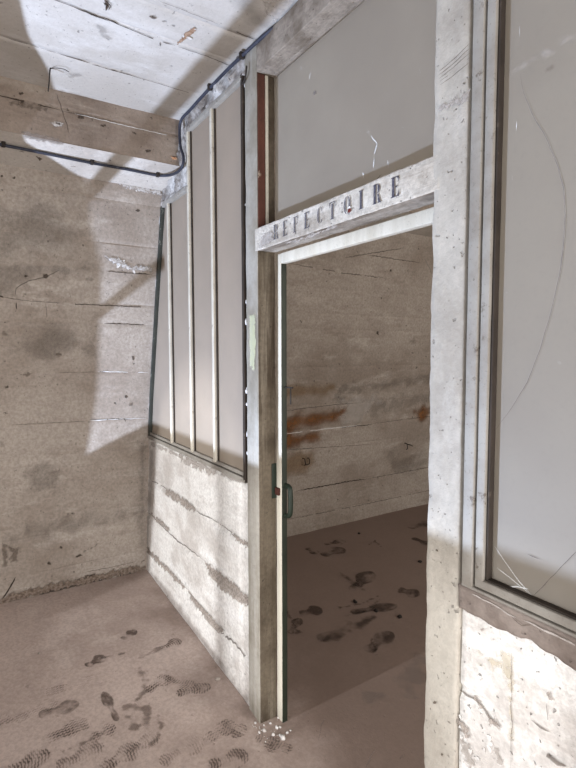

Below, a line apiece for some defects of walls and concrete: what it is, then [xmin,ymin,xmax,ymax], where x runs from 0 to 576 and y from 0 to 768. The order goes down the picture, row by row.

corrosion [287,410,345,447]
spalling [0,561,146,604]